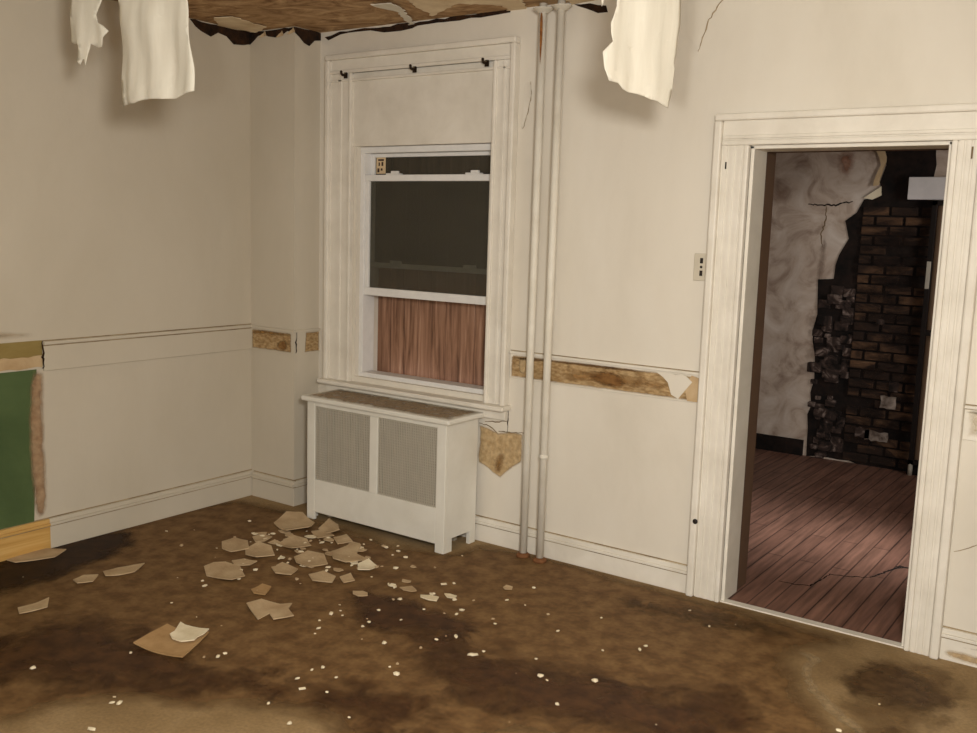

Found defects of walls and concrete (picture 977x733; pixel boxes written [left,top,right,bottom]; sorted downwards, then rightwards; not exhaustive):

spalling [190,0,527,46]
spalling [566,0,608,13]
flaking render [806,150,937,472]
peeling [252,330,319,353]
peeling [512,356,699,402]
peeling [0,340,46,530]
peeling [479,412,522,476]
peeling [7,548,66,563]
leakage [0,501,956,733]